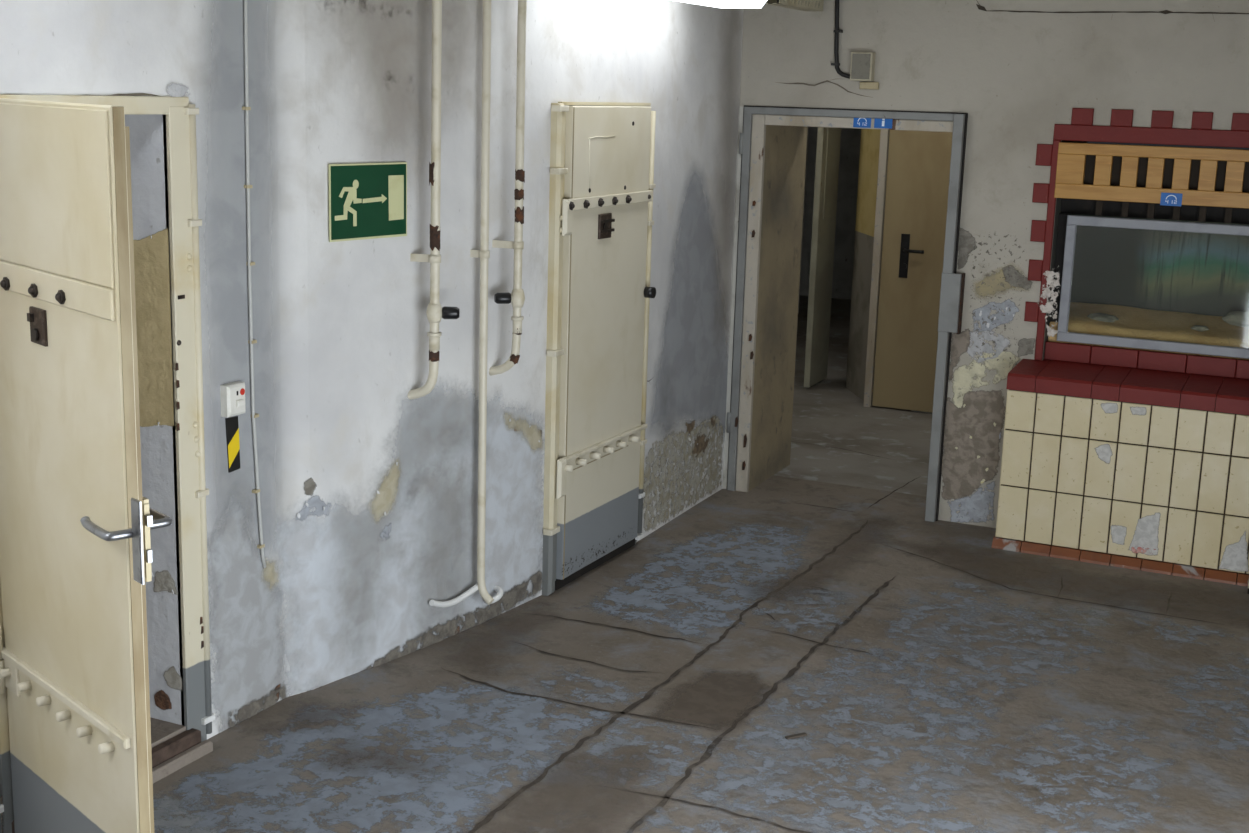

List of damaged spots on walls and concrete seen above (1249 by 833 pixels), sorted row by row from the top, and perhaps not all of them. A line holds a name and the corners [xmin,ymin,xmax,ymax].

crack [976,1,1249,22]
water stain [653,174,728,431]
peeling [1037,266,1061,337]
flaking render [941,228,1024,500]
spalling [1101,403,1146,415]
peeling [296,478,331,520]
peeling [372,461,400,538]
flaking render [643,416,723,531]
spalling [1111,513,1160,555]
spalling [1219,532,1249,572]
peeling [152,523,1185,833]
water stain [656,671,768,729]